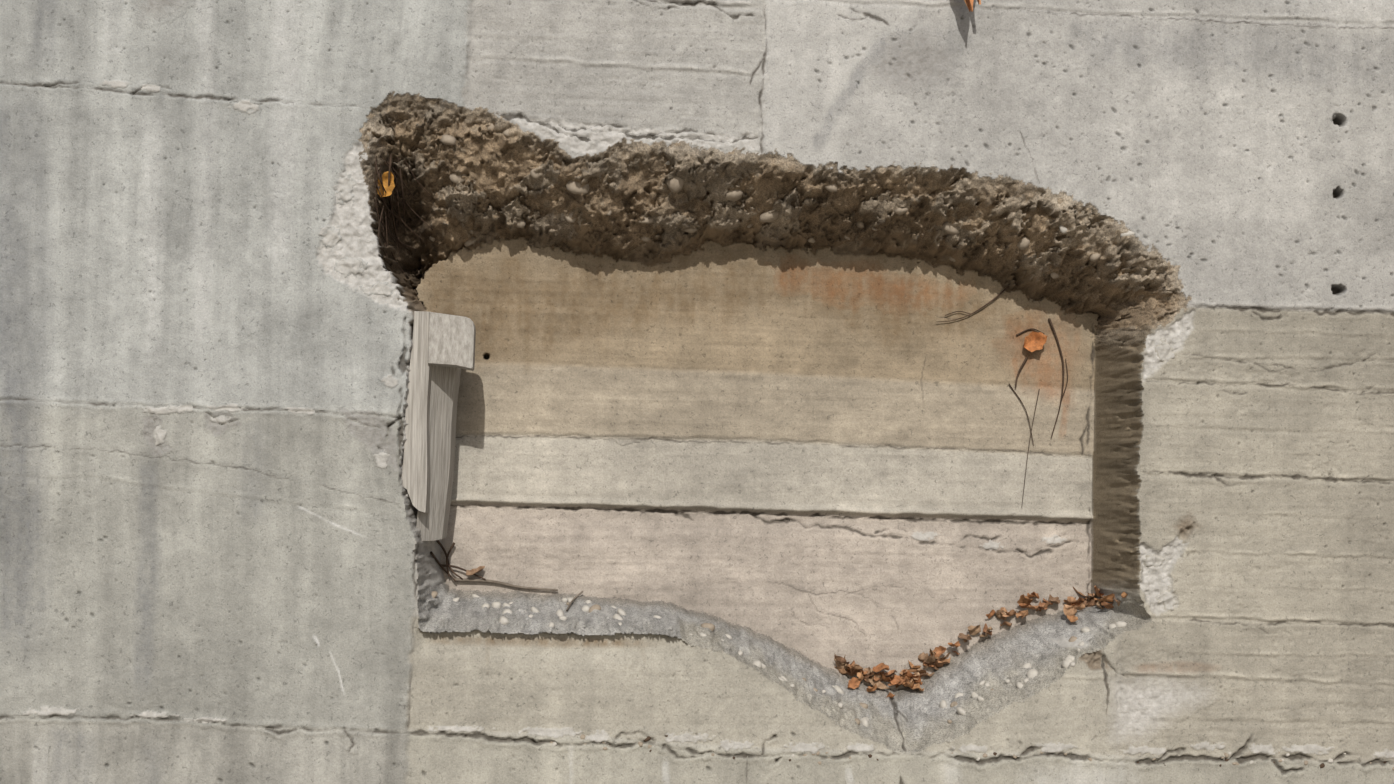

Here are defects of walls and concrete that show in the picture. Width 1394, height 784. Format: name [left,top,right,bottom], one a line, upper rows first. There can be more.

crack [495,0,769,159]
spalling [337,405,402,473]
spalling [313,92,1197,384]
crack [935,283,1012,321]
rust [991,305,1090,441]
crack [1189,303,1394,322]
crack [0,315,1394,784]
spalling [417,510,1221,752]